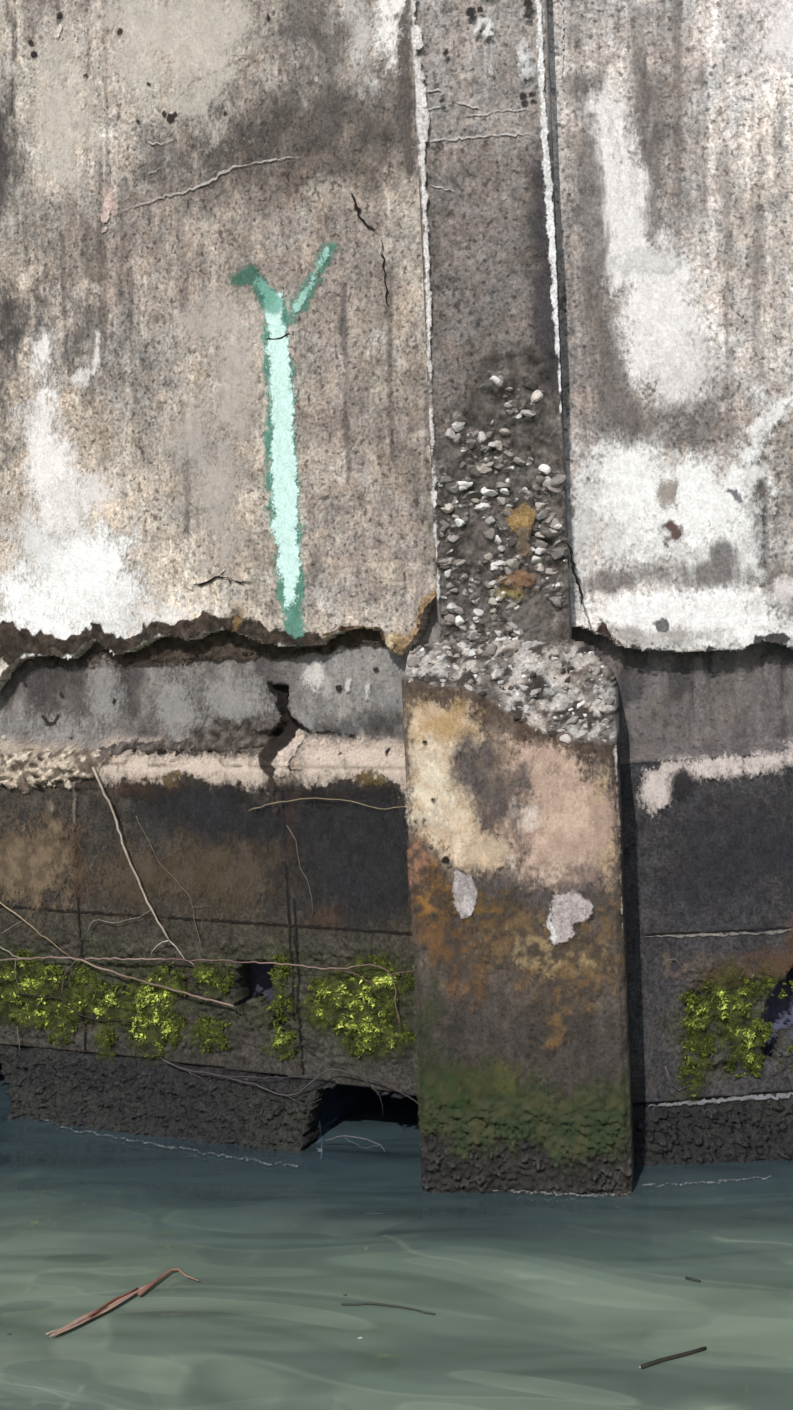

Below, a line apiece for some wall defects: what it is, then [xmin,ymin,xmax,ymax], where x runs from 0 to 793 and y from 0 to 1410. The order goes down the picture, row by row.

leakage [465,6,494,36]
leakage [0,0,444,599]
leakage [517,0,793,650]
leakage [0,274,411,927]
spalling [0,365,620,944]
spalling [653,618,669,631]
crack [126,681,355,815]
rust [407,818,525,1001]
rust [512,938,606,976]